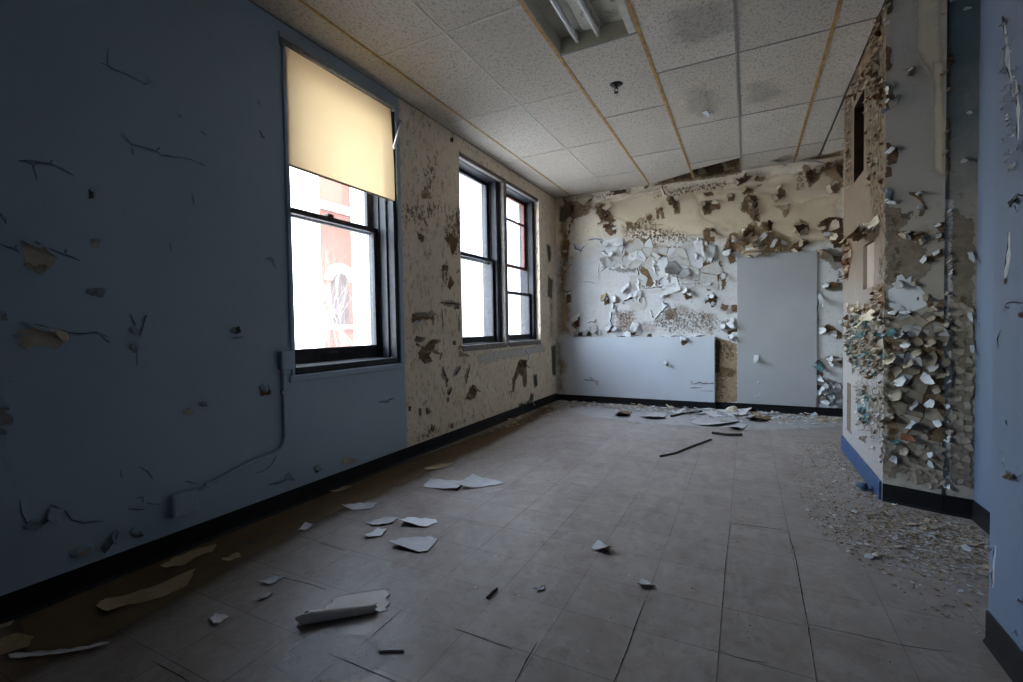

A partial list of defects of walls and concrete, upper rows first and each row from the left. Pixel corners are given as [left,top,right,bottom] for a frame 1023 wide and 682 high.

peeling [997,15,1020,172]
crack [120,133,206,166]
crack [18,160,74,181]
spalling [402,151,461,289]
peeling [22,239,80,275]
spalling [561,0,976,491]
peeling [13,321,110,350]
peeling [410,311,441,364]
spalling [509,359,530,398]
crack [19,500,103,531]